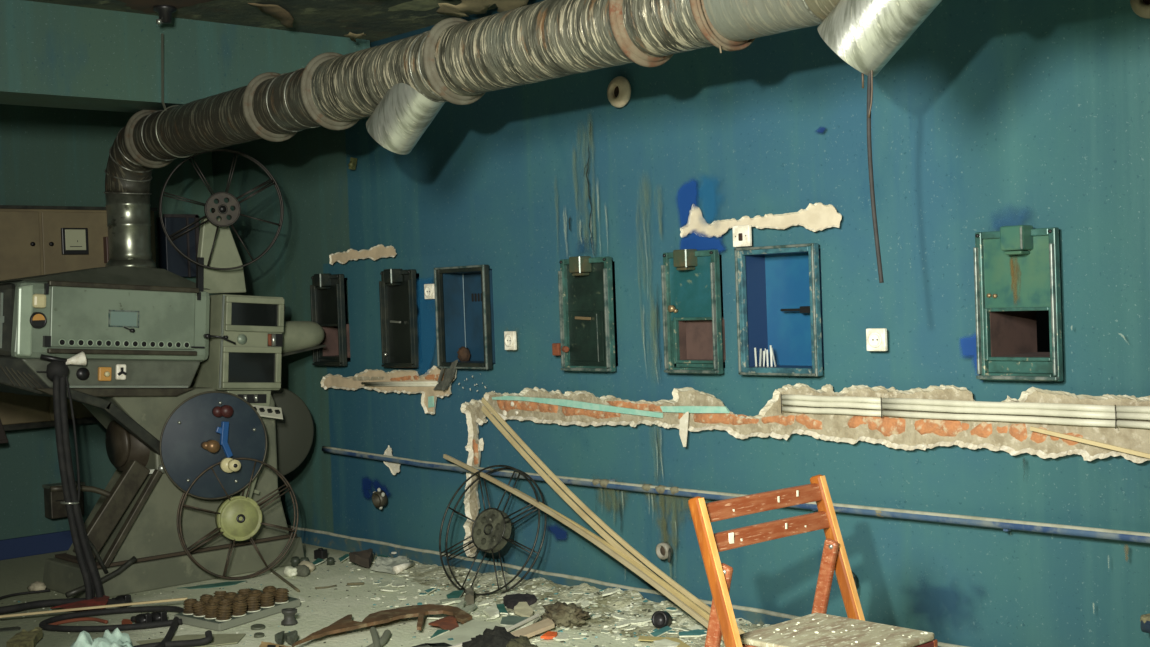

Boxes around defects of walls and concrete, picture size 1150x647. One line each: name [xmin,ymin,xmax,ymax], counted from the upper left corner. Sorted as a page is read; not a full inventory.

peeling [436,0,529,17]
crack [569,122,595,256]
flaking render [680,203,842,238]
flaking render [329,244,397,265]
flaking render [321,360,1150,557]